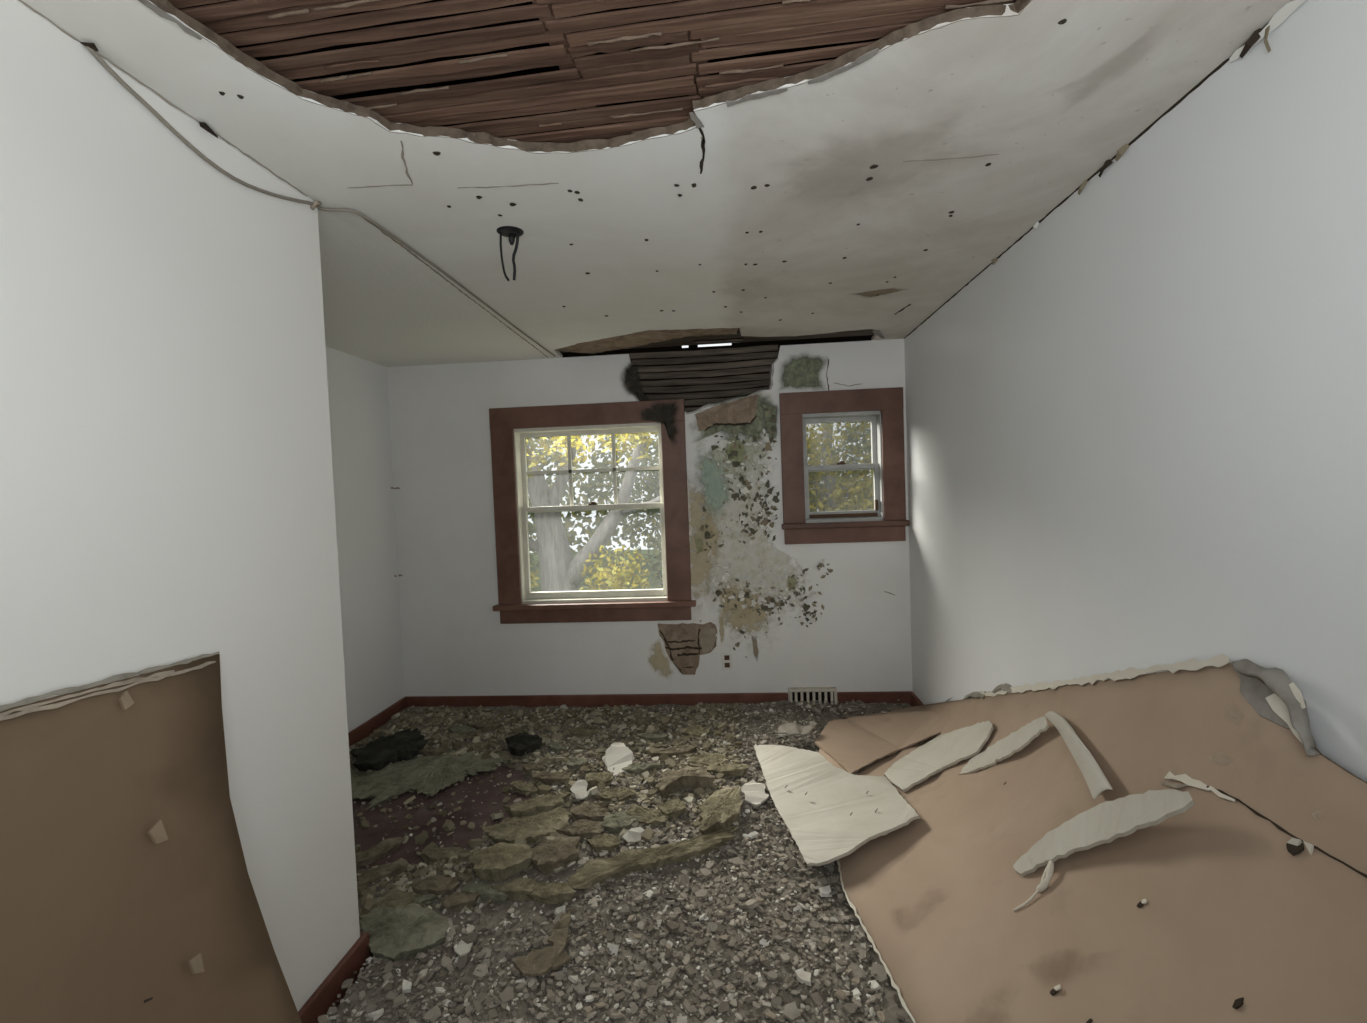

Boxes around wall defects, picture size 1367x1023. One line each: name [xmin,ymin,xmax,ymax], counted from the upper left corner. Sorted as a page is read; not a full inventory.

flaking render [149,0,1032,154]
crack [697,128,705,174]
damp [857,289,899,297]
damp [781,356,829,391]
peeling [608,345,833,675]